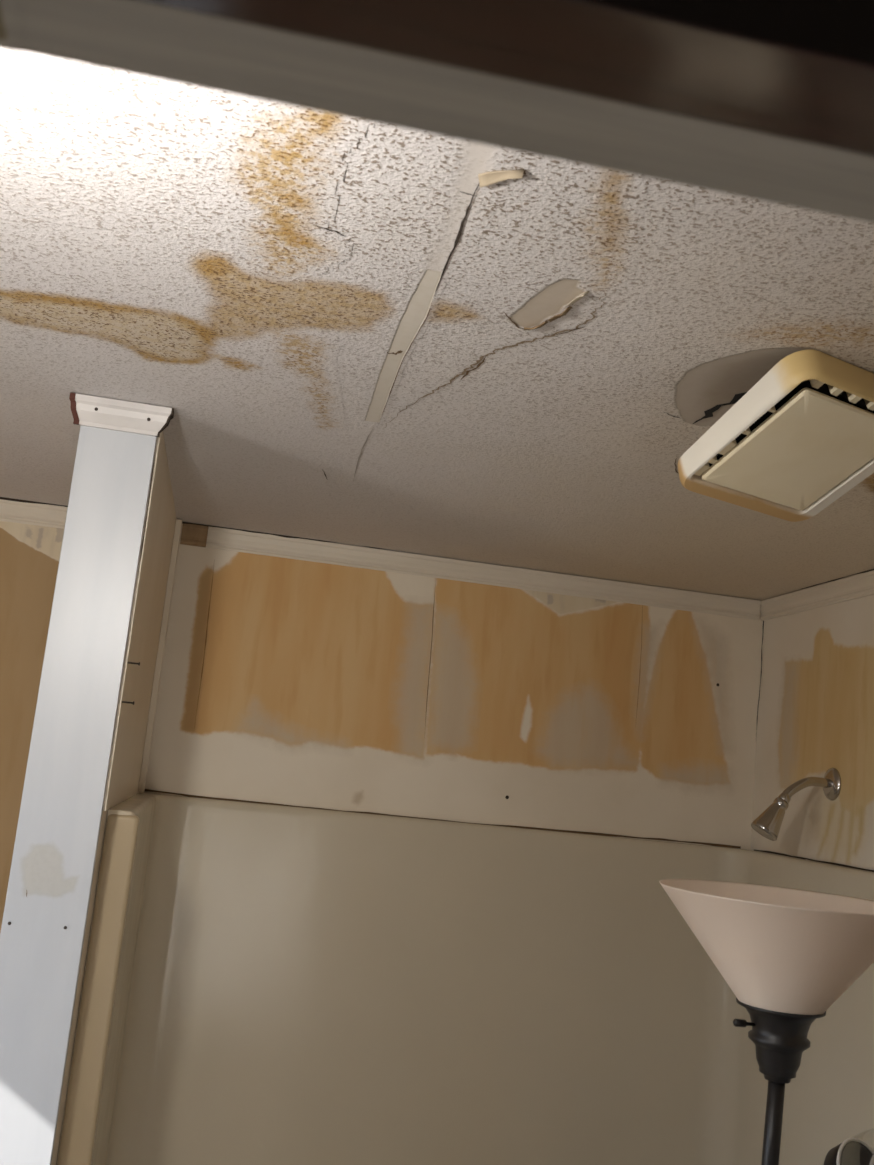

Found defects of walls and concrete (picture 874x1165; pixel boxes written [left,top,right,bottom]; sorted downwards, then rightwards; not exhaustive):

leakage [0,100,404,433]
leakage [428,295,491,329]
crack [386,290,607,426]
peeling [501,275,592,331]
leakage [568,163,649,298]
peeling [657,339,855,432]
leakage [852,473,874,496]